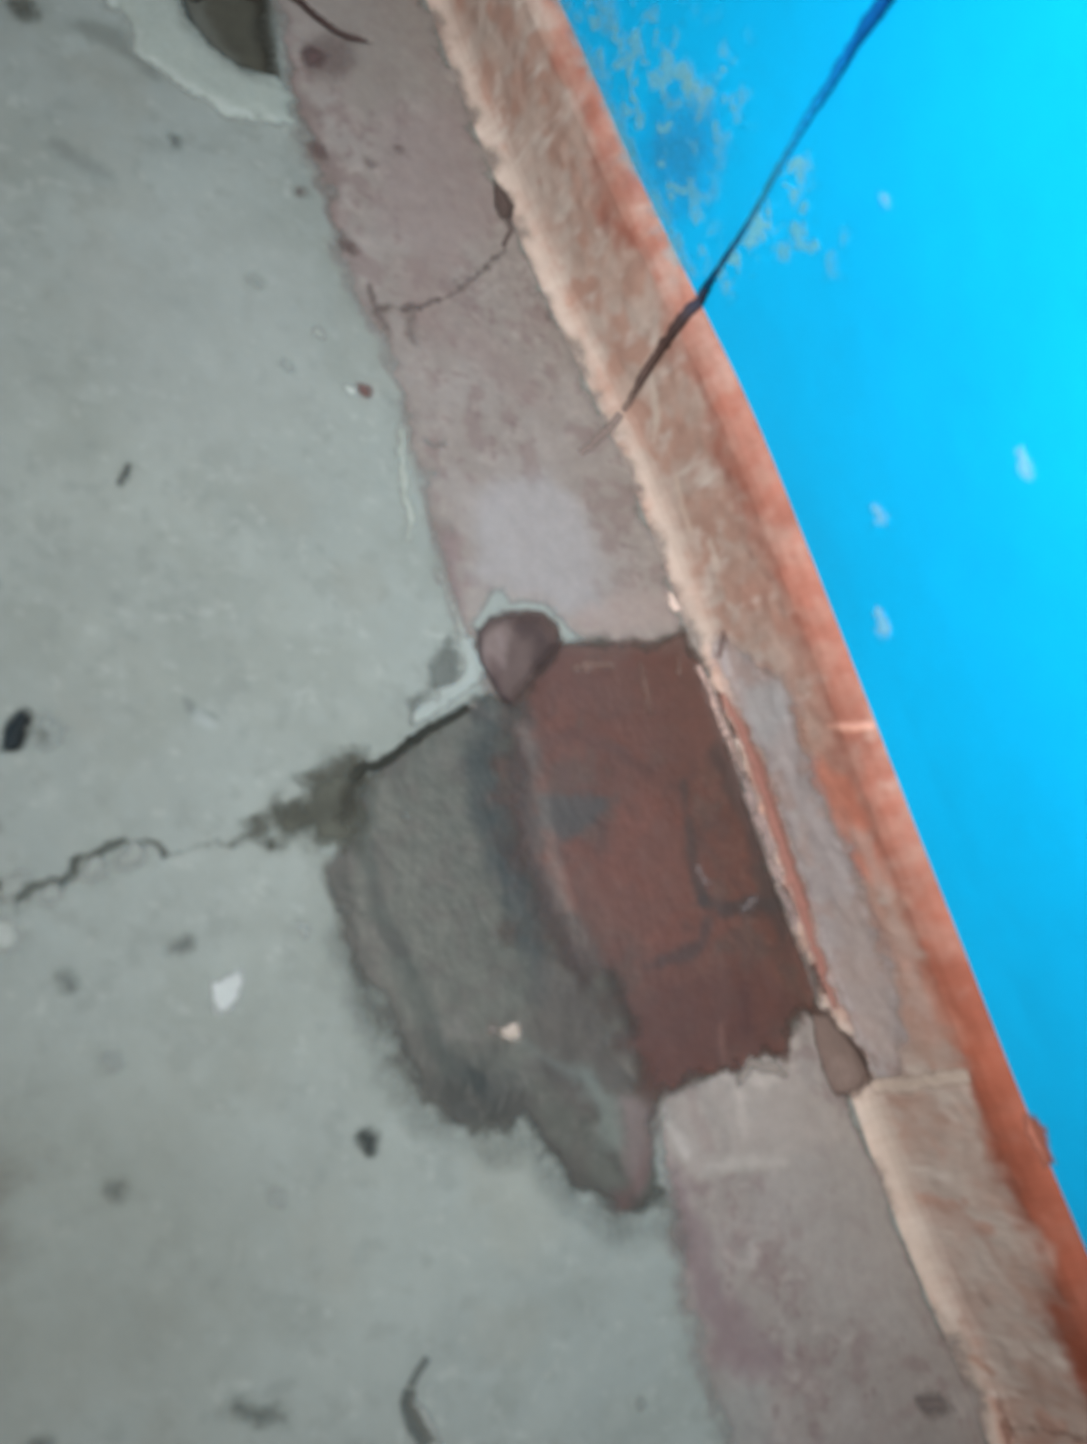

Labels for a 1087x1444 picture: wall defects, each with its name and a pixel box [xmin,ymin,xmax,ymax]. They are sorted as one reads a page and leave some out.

peeling [590,9,712,221]
peeling [494,180,514,248]
crack [579,0,893,456]
peeling [729,209,770,265]
peeling [778,158,818,256]
crack [369,256,499,331]
peeling [669,593,680,611]
damp [240,754,366,849]
crack [0,838,166,903]
spalling [325,630,908,1213]
spalling [401,1357,443,1444]